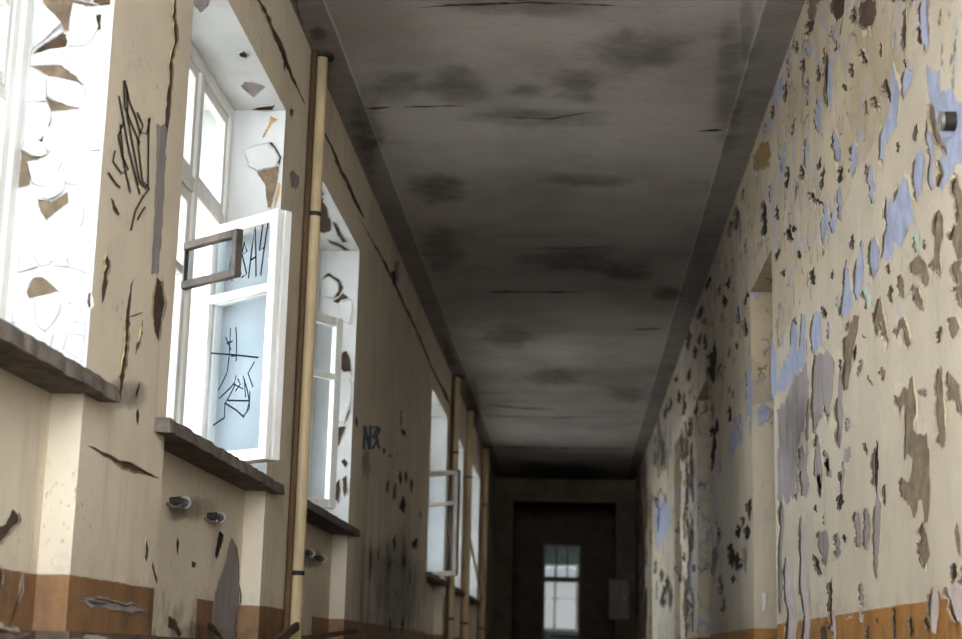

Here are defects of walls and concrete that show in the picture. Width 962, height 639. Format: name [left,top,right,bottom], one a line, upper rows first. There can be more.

crack [165,0,179,134]
crack [257,0,306,105]
crack [419,0,617,8]
peeling [12,0,114,365]
peeling [239,80,299,210]
peeling [635,0,962,639]
peeling [0,510,22,545]
crack [89,446,158,478]
peeling [386,471,413,513]
peeling [207,531,242,639]